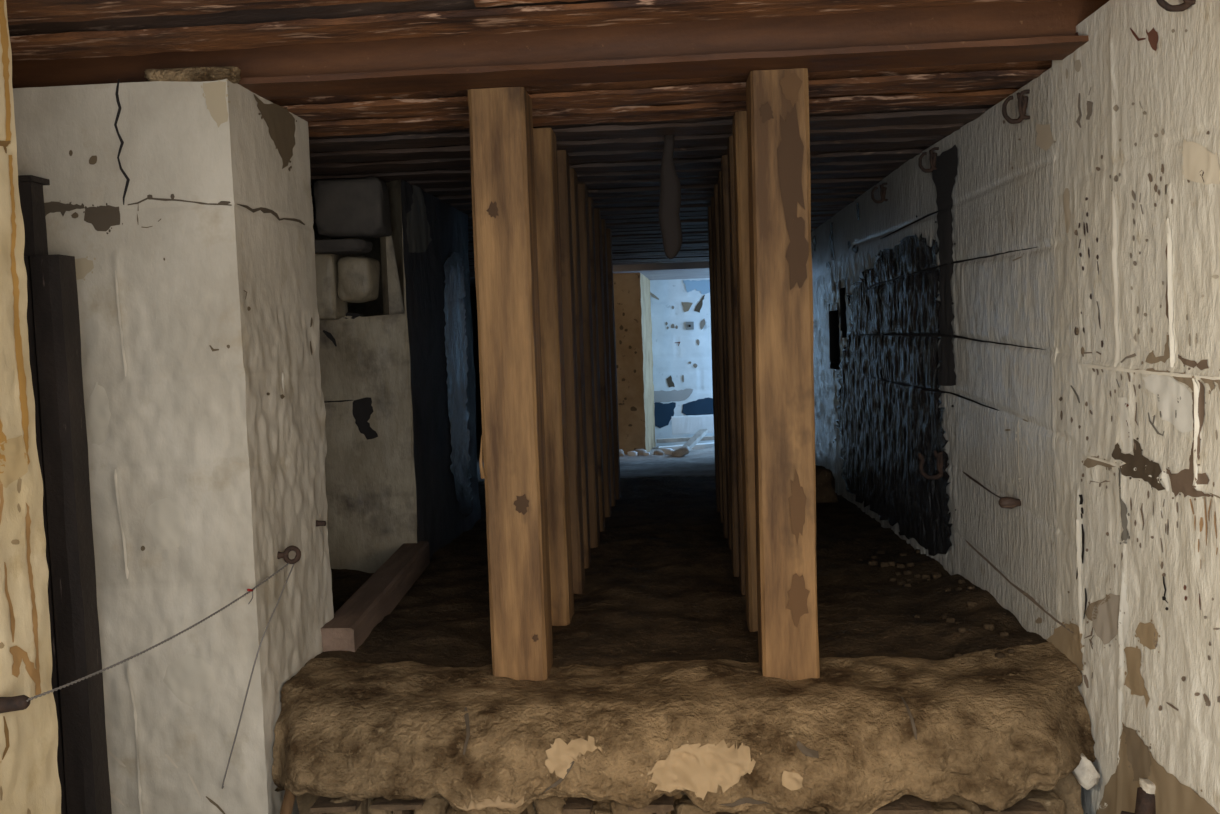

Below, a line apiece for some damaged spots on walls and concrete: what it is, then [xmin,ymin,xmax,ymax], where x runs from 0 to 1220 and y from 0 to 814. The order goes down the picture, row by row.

crack [114,79,305,228]
spalling [254,95,297,171]
corrosion [0,0,30,464]
spalling [352,397,378,440]
peeling [1081,304,1220,577]